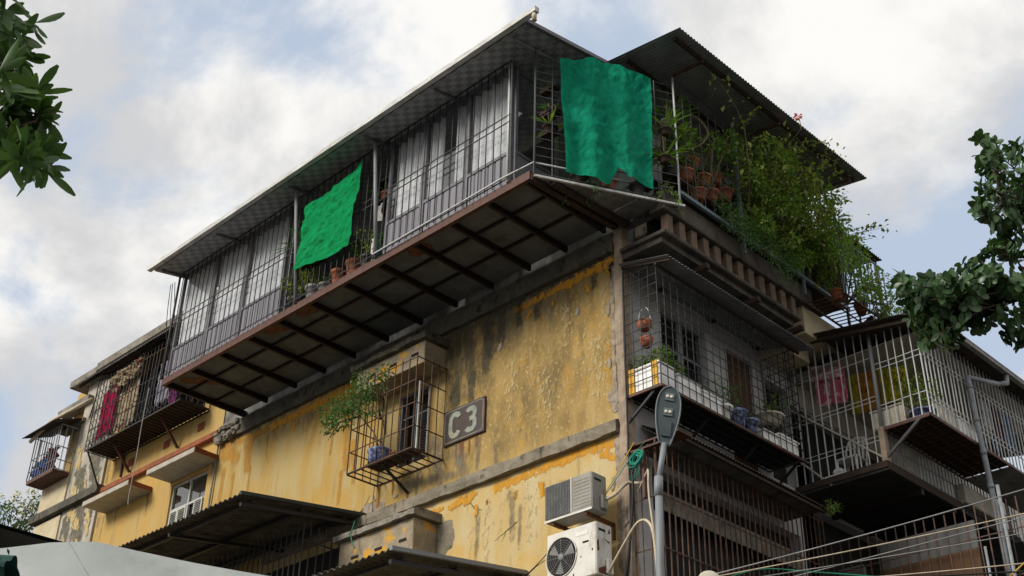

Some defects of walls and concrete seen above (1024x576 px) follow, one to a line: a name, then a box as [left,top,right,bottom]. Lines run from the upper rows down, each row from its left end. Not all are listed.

damp [446,259,607,421]
peeling [515,257,619,412]
peeling [62,446,99,542]
peeling [431,437,624,573]